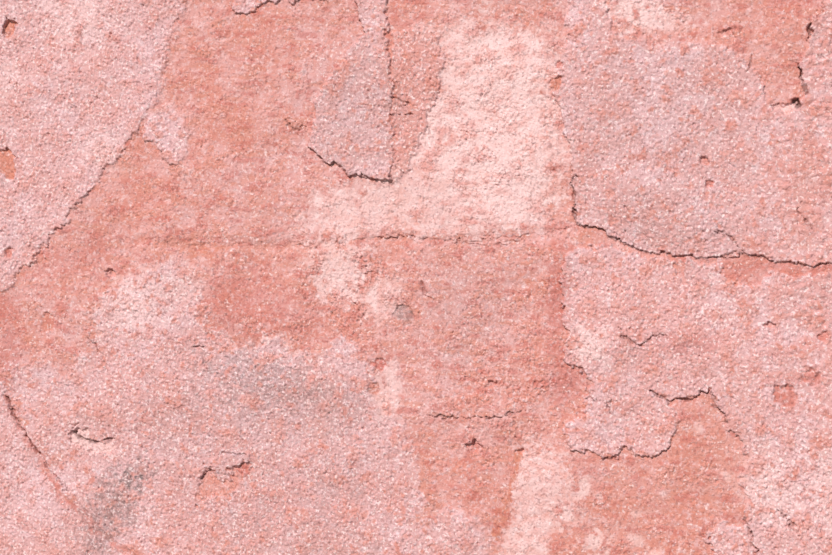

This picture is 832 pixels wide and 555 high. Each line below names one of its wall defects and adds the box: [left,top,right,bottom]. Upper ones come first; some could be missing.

peeling [597,0,832,115]
crack [805,23,814,43]
crack [792,63,809,110]
crack [285,116,308,131]
peeling [0,0,571,368]
crack [279,175,832,268]
peeling [368,63,770,555]
spalling [770,366,824,411]
spalling [68,427,119,460]
crack [0,388,140,555]
spalling [195,453,253,508]
crack [743,515,760,555]